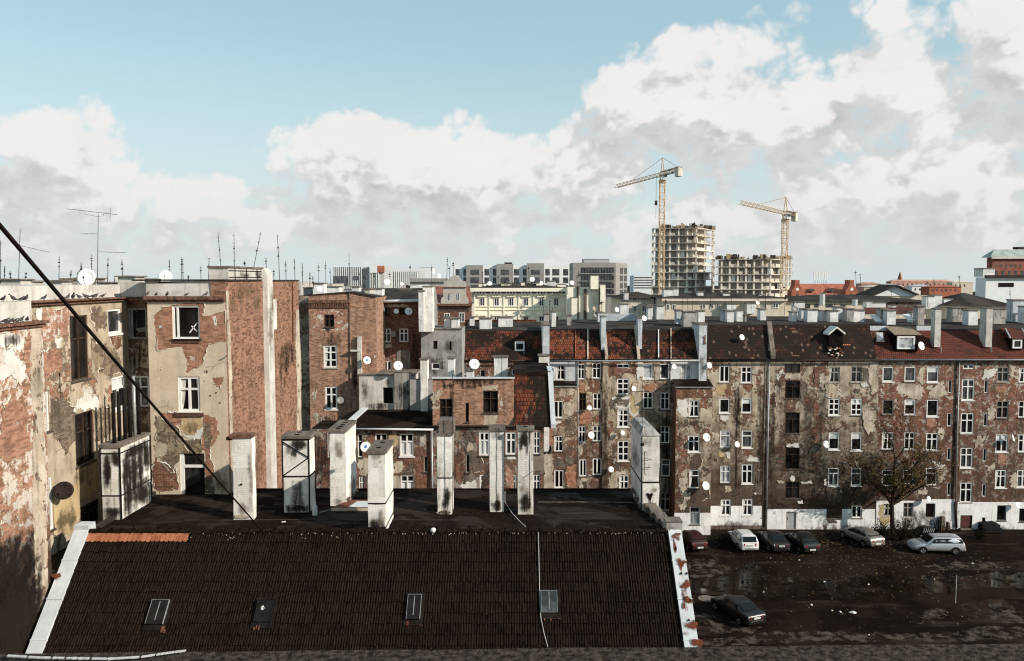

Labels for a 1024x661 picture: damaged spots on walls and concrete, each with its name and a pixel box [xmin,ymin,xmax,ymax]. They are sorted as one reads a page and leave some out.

flaking render [0,396,31,465]
flaking render [3,307,70,385]
flaking render [89,306,123,380]
flaking render [151,411,220,494]
flaking render [154,302,244,403]
flaking render [544,411,626,488]
flaking render [554,362,661,424]
spalling [675,416,760,515]
flaking render [896,381,947,400]
flaking render [986,453,1017,489]
rust [672,533,692,610]
rust [684,622,704,647]